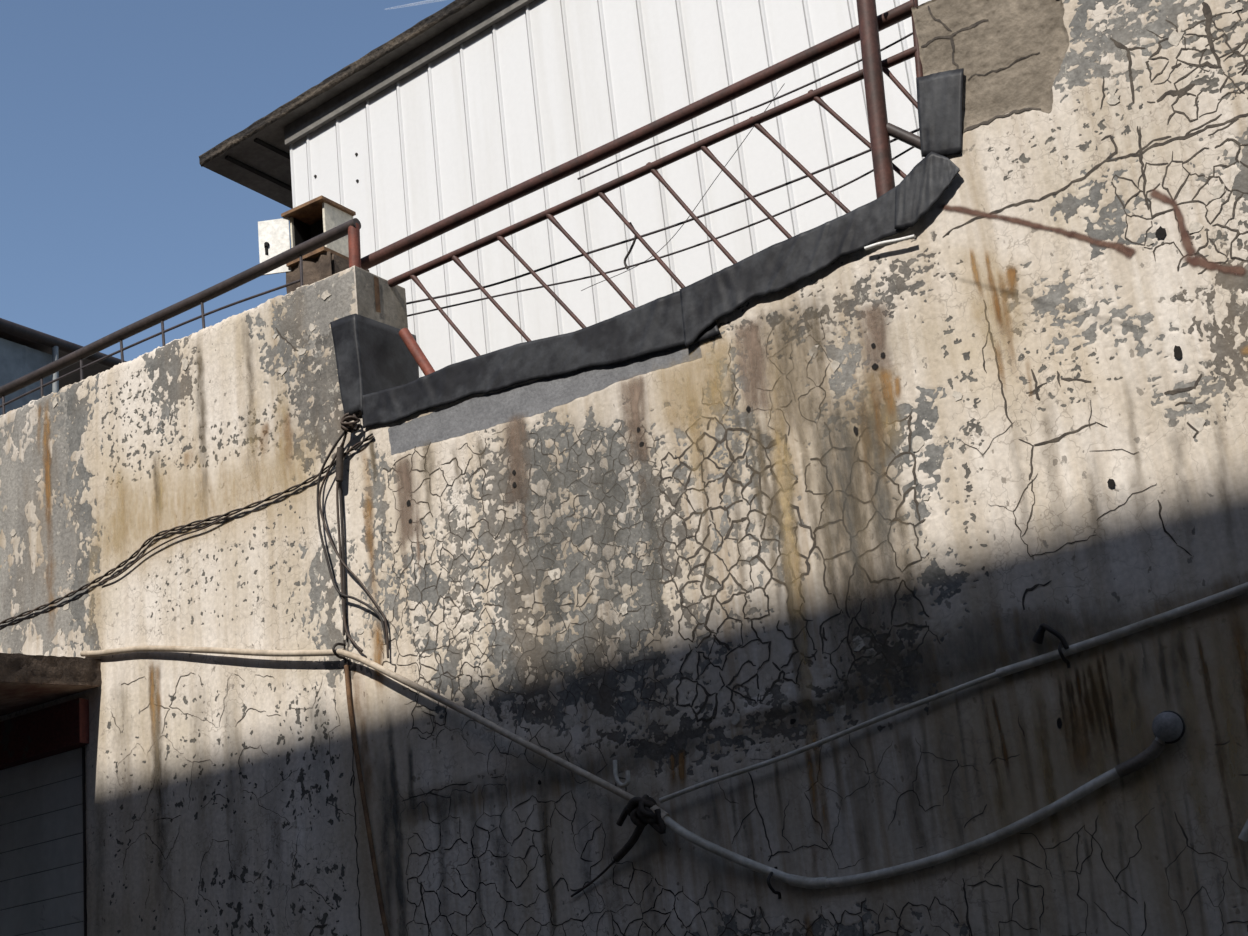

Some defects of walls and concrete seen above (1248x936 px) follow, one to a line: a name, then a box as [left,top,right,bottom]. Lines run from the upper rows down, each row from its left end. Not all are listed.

crack [943,0,1248,274]
corrosion [970,252,1016,321]
corrosion [940,205,1135,257]
spalling [911,0,1248,442]
corrosion [1151,190,1245,275]
corrosion [864,309,900,446]
corrosion [39,409,51,520]
peeling [0,231,989,831]
corrosion [776,428,794,543]
corrosion [1059,656,1115,753]
crack [111,614,362,936]
peeling [696,897,932,936]